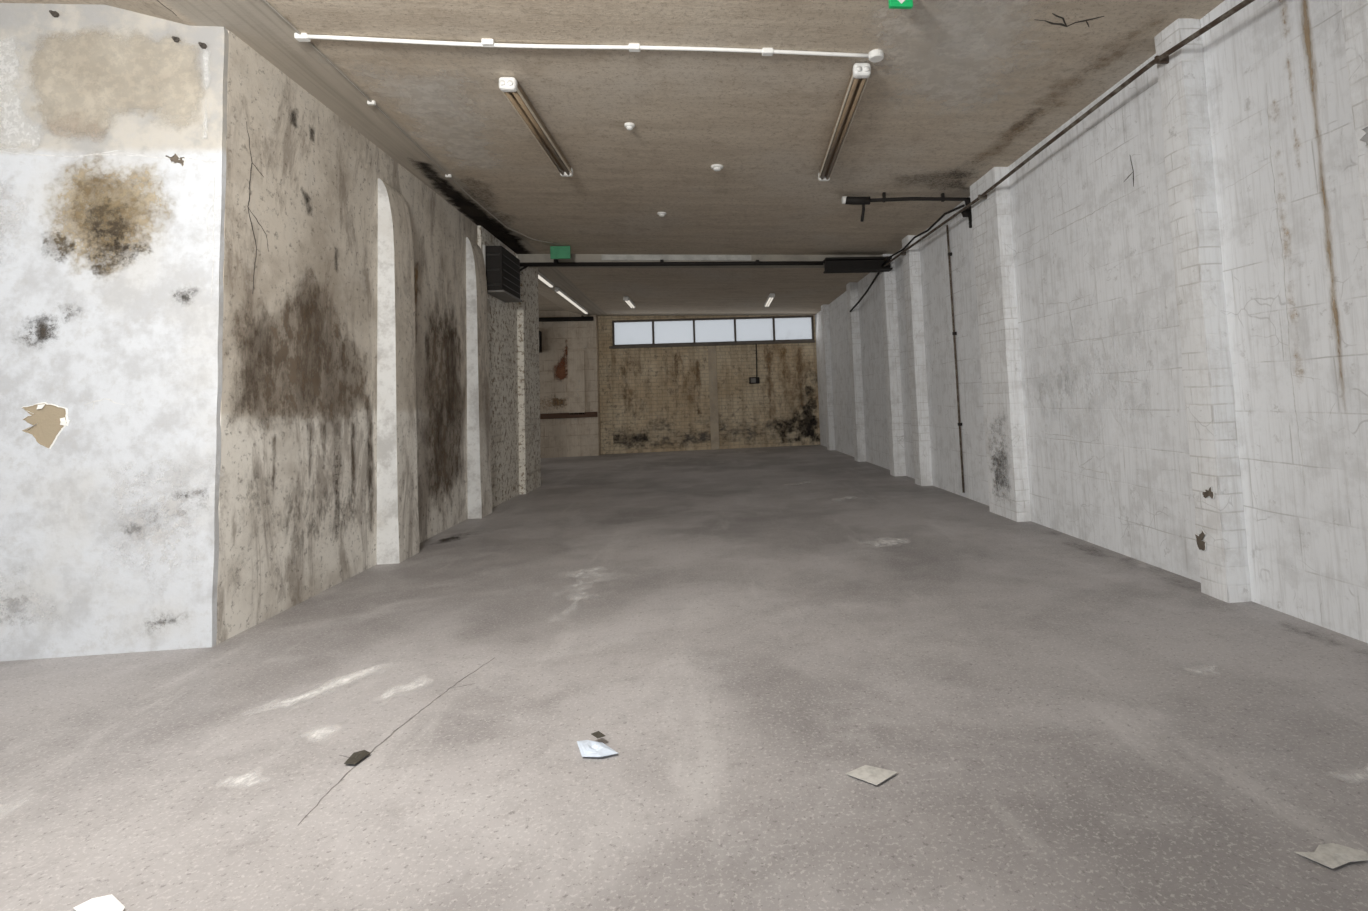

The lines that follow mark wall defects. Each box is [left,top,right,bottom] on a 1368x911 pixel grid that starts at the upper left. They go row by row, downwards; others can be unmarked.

leakage [44,164,166,275]
peeling [22,402,70,449]
leakage [235,274,372,512]
leakage [425,311,462,511]